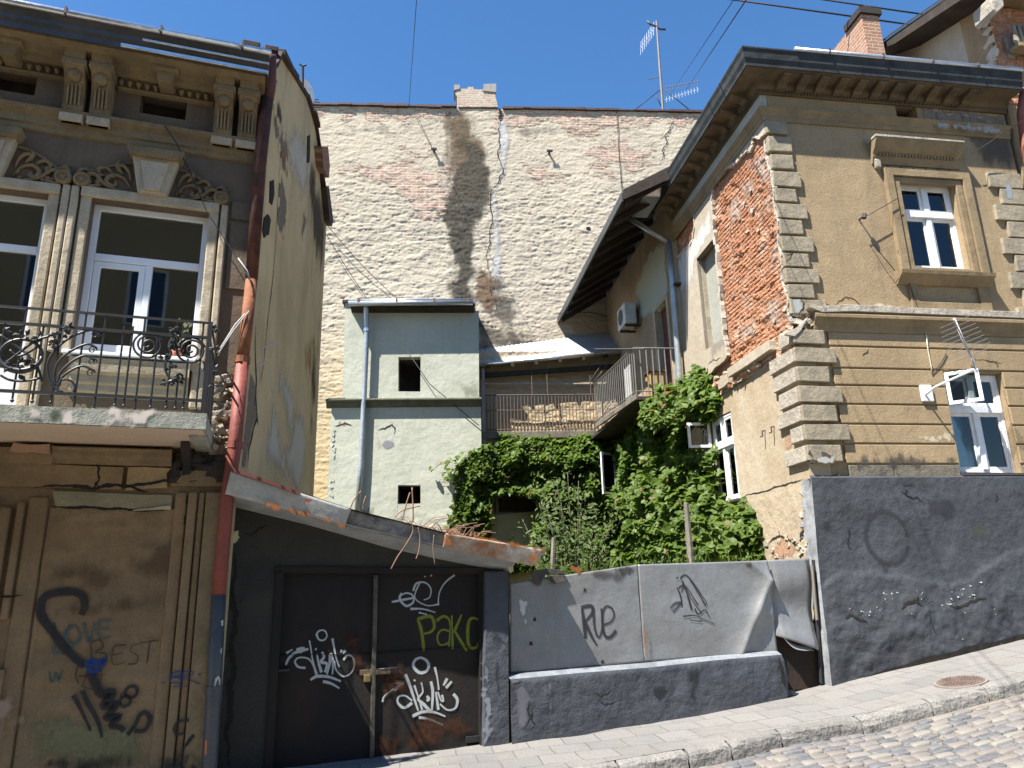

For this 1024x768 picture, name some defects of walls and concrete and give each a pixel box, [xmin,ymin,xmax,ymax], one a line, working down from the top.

damp [437,112,522,347]
crack [486,108,504,317]
spalling [710,121,814,401]
crack [35,464,188,527]
corrosion [266,502,345,528]
corrosion [473,536,546,561]
spalling [760,478,812,558]